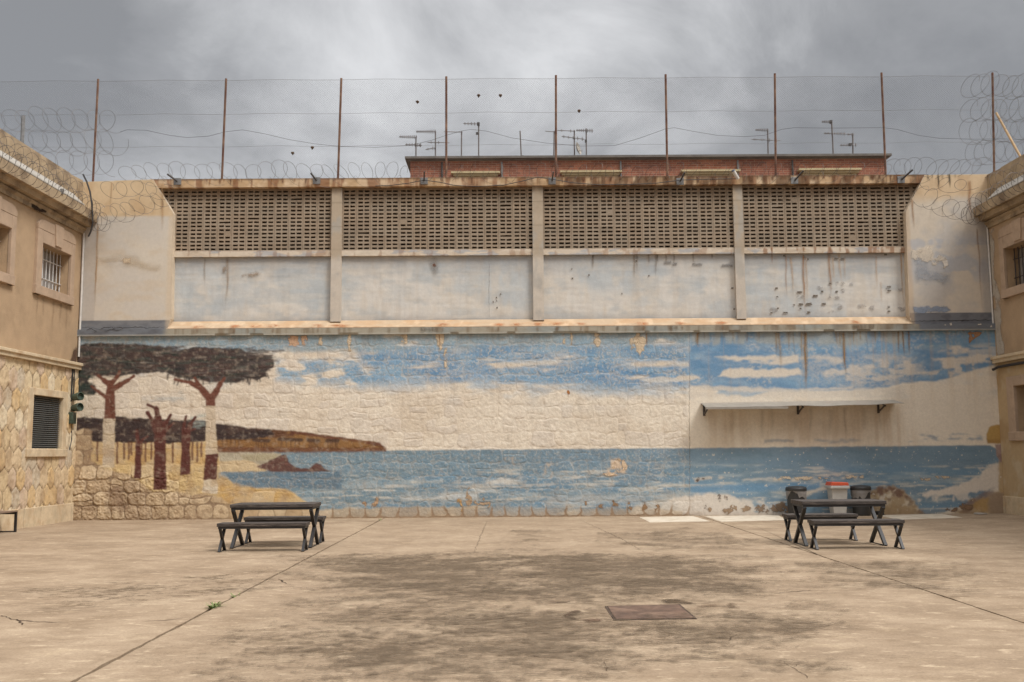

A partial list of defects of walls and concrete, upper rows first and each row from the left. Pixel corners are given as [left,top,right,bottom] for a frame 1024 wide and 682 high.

spalling [771,282,852,313]
peeling [629,333,647,354]
flaking render [73,446,683,520]
spalling [708,494,788,514]